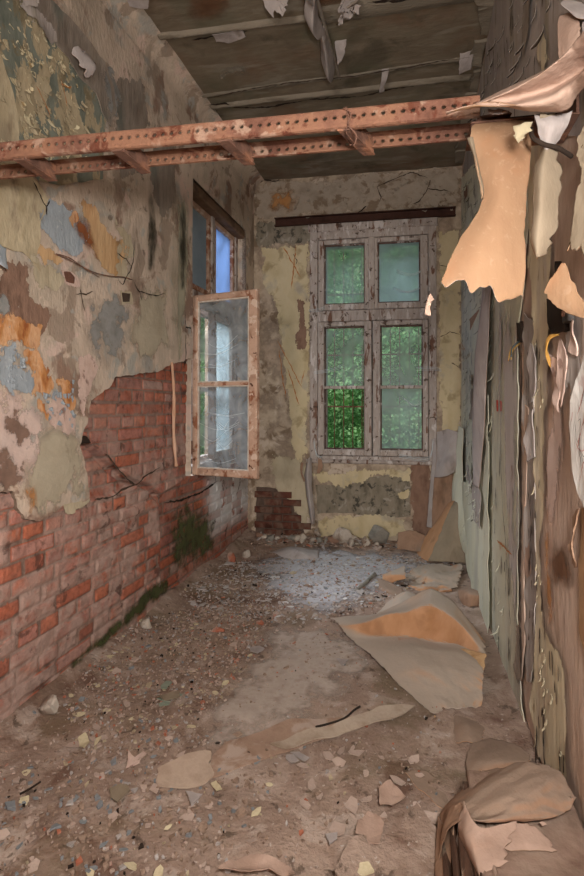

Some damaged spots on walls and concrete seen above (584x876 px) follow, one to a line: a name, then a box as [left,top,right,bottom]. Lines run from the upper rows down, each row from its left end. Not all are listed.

peeling [468,0,568,123]
peeling [568,89,584,137]
peeling [254,151,484,248]
crack [359,172,451,212]
spalling [0,0,431,722]
crack [95,454,160,500]
crack [165,480,219,503]
peeling [461,145,584,779]